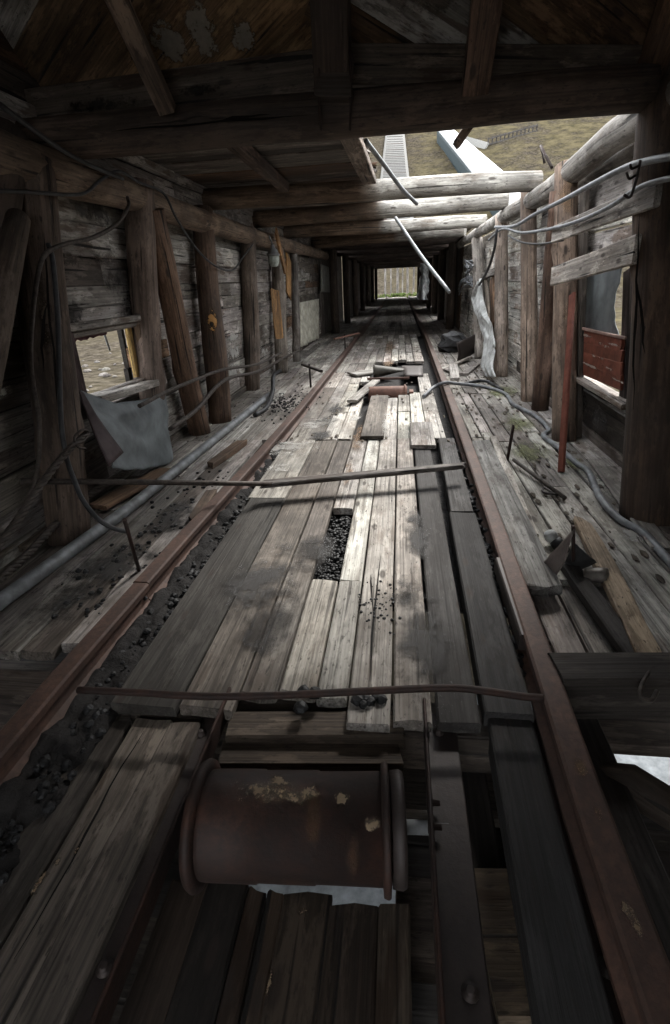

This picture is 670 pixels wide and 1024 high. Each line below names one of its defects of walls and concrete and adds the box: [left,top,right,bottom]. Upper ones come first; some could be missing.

peeling [242,776,319,804]
peeling [335,792,348,805]